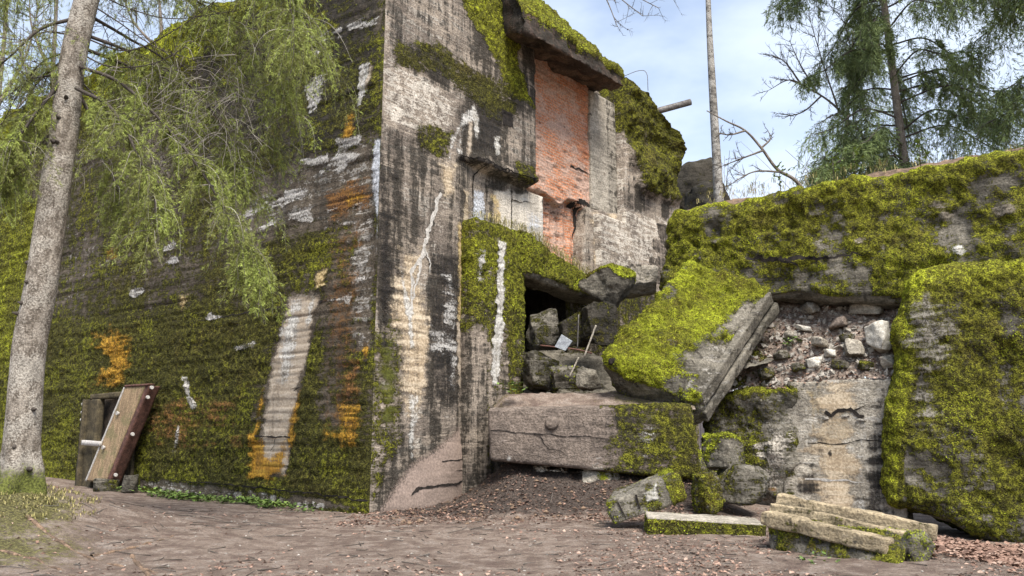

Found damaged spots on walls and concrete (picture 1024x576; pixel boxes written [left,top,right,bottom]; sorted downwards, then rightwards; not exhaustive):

leakage [352,98,506,457]
crack [491,430,620,453]
crack [808,405,882,445]
crack [412,459,463,495]